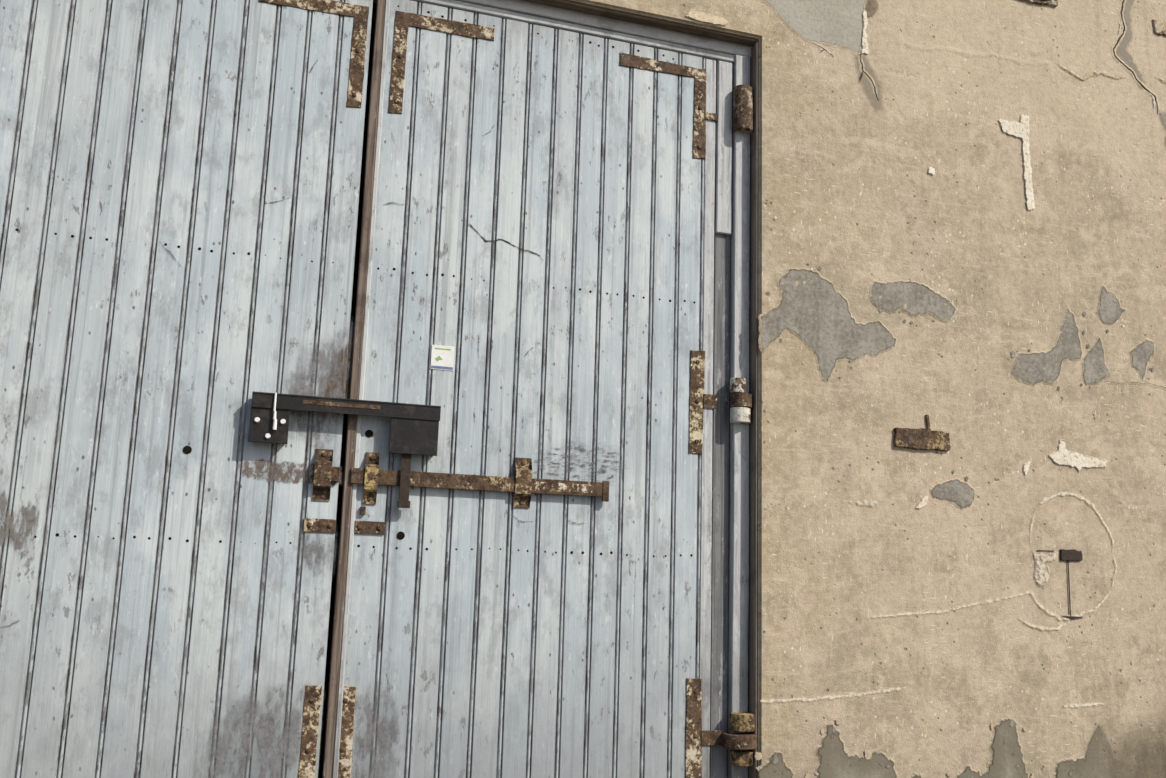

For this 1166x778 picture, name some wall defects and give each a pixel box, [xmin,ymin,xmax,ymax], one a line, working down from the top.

peeling [761,0,879,55]
crack [808,42,882,108]
crack [1110,0,1160,115]
spalling [999,114,1035,210]
crack [469,224,540,256]
peeling [758,264,957,383]
peeling [1011,284,1126,390]
peeling [916,470,975,510]
peeling [755,718,923,778]
peeling [937,716,1101,778]